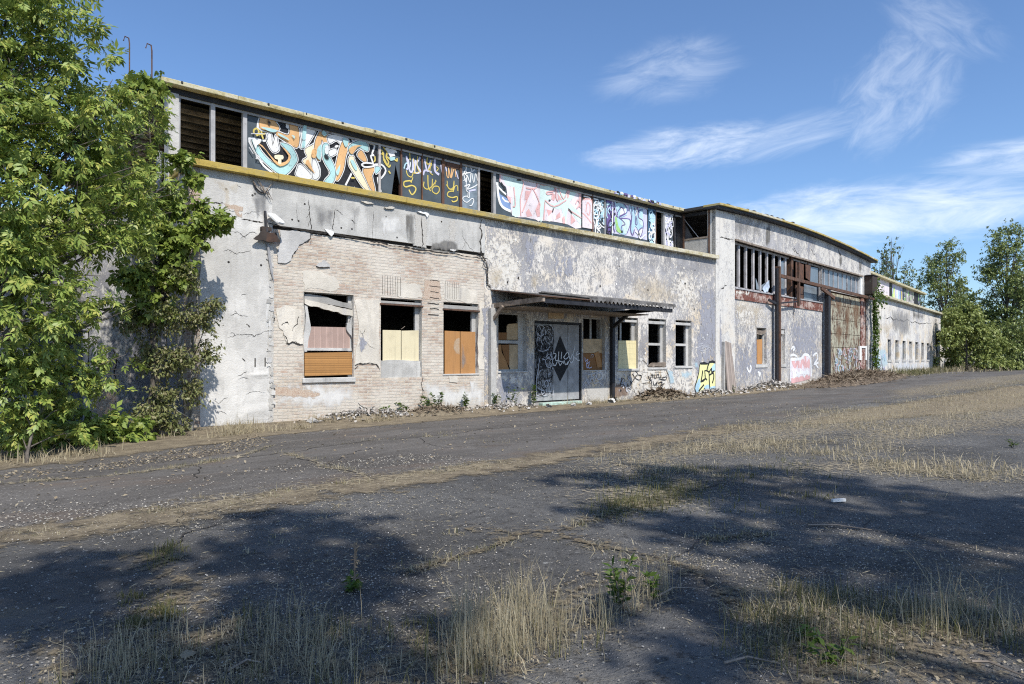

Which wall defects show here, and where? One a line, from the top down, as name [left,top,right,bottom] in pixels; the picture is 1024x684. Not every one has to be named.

crack [202,185,492,289]
spalling [266,242,320,422]